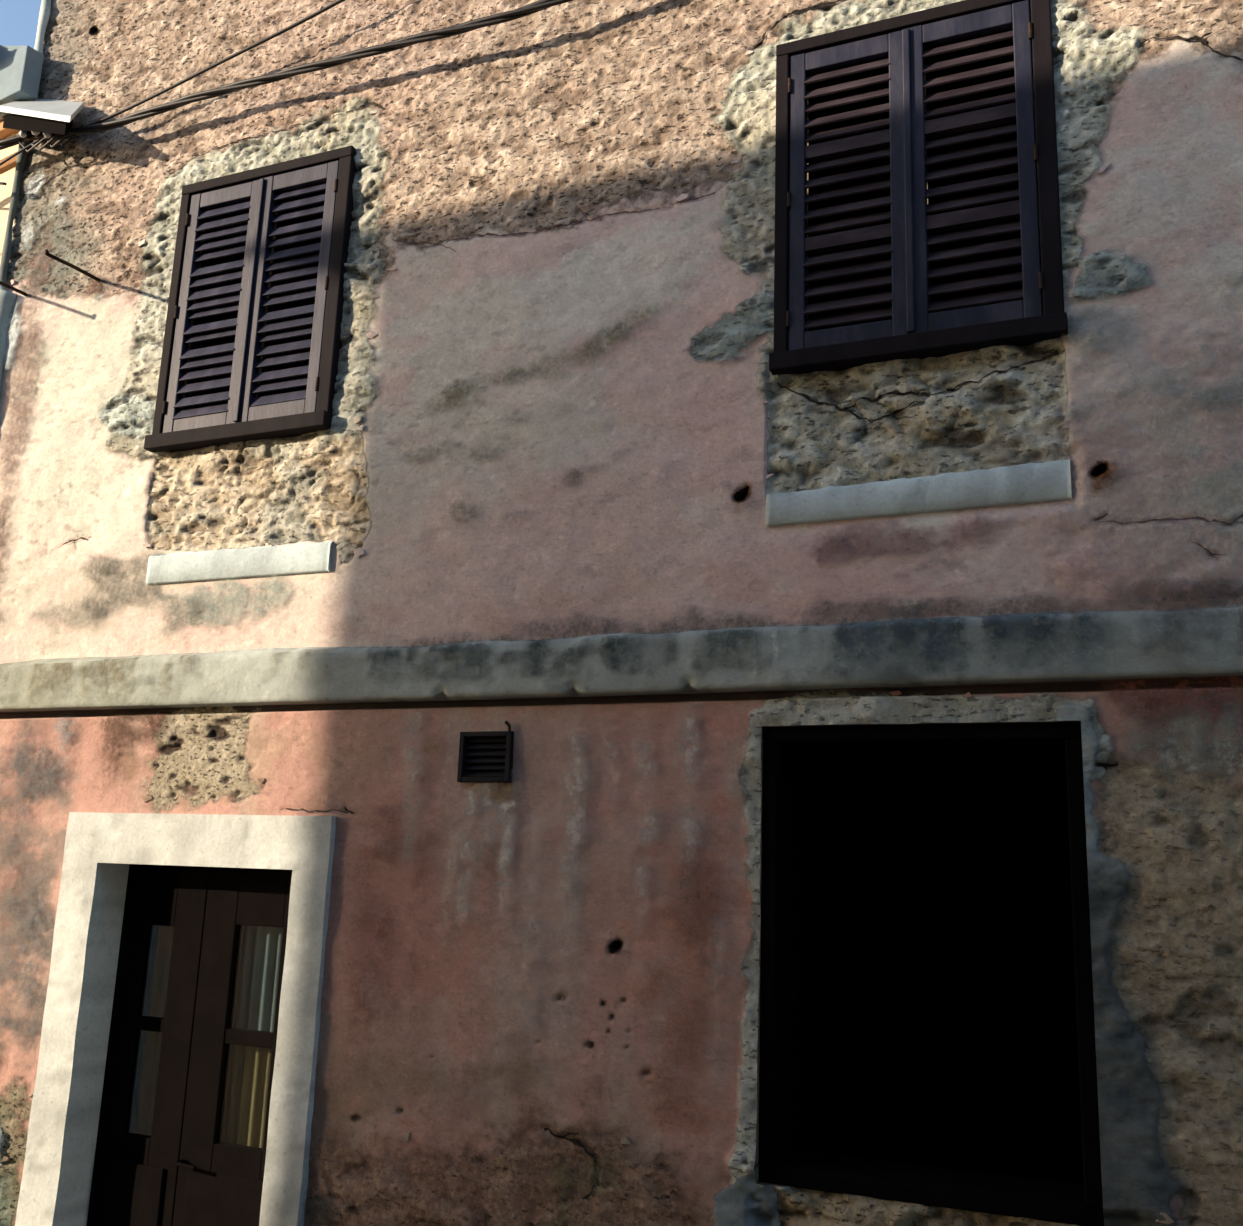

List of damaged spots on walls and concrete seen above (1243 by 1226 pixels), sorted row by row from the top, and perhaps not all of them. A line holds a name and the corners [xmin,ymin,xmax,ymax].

crack [1140,32,1243,61]
damp [0,305,42,558]
flaking render [762,337,1071,497]
crack [777,353,1058,423]
flaking render [143,416,371,564]
crack [1094,513,1243,559]
damp [368,609,781,677]
damp [799,580,1243,670]
flaking render [142,706,266,814]
damp [461,782,515,887]
flaking render [1094,675,1243,1226]
crack [544,1128,599,1199]